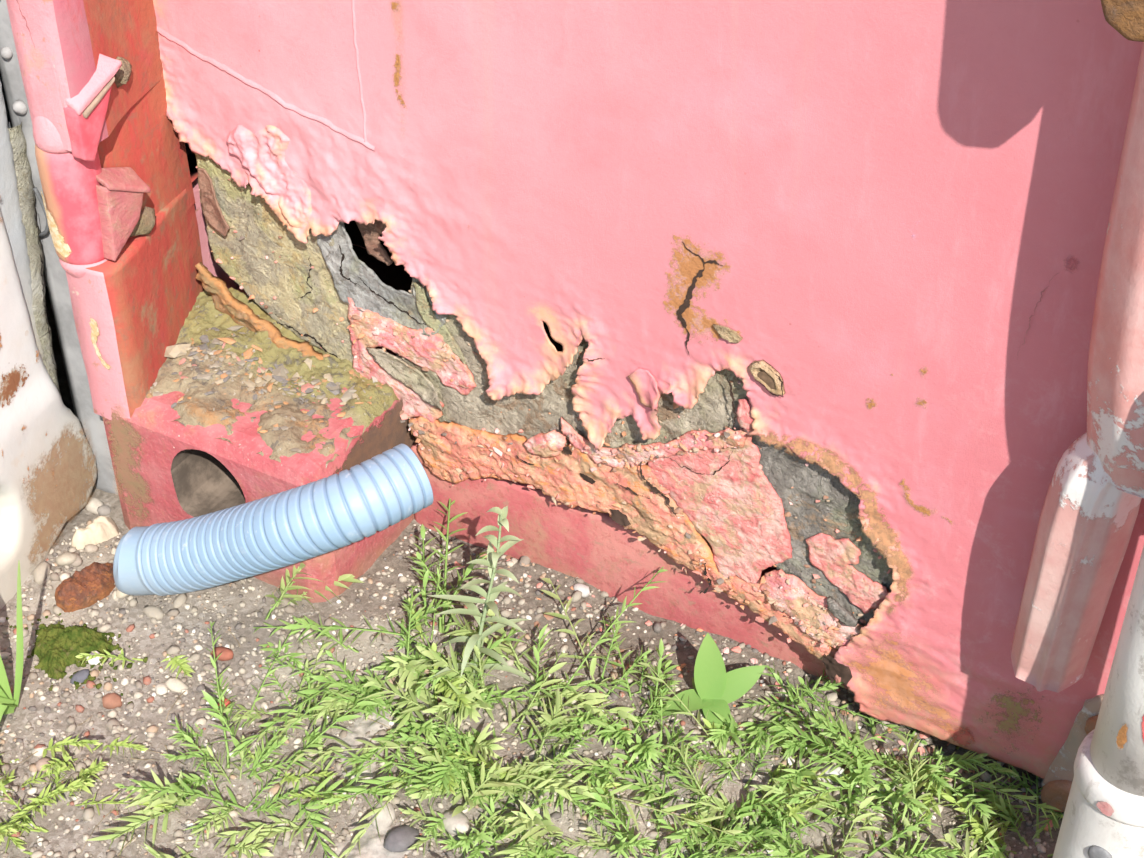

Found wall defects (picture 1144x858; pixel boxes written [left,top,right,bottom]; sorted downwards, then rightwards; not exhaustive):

corrosion [394,54,406,107]
corrosion [0,350,40,408]
corrosion [23,430,95,562]
corrosion [150,262,384,436]
spalling [195,154,893,651]
corrosion [335,399,960,735]
crack [617,373,737,515]
crack [663,235,743,354]